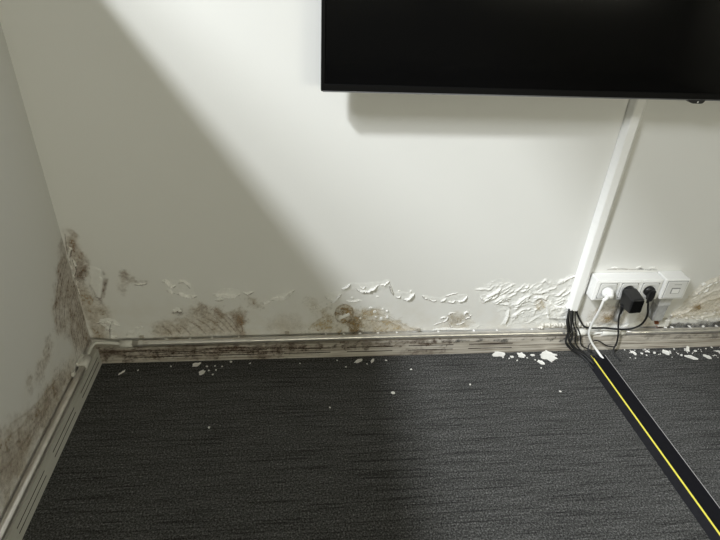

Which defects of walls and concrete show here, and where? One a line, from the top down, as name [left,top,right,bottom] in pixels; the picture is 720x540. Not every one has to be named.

peeling [325,279,480,332]
damp [98,343,307,362]